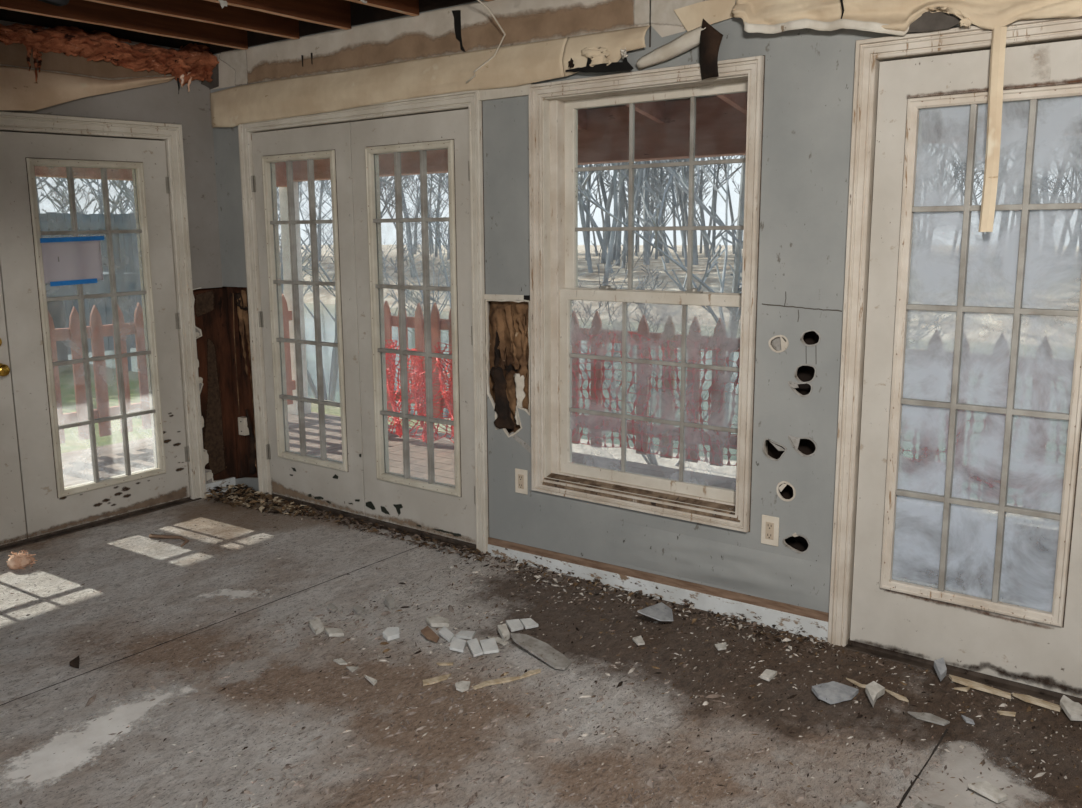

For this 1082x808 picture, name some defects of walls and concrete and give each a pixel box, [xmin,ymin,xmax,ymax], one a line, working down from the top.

flaking render [211,0,686,90]
spalling [193,286,258,482]
spalling [484,294,531,454]